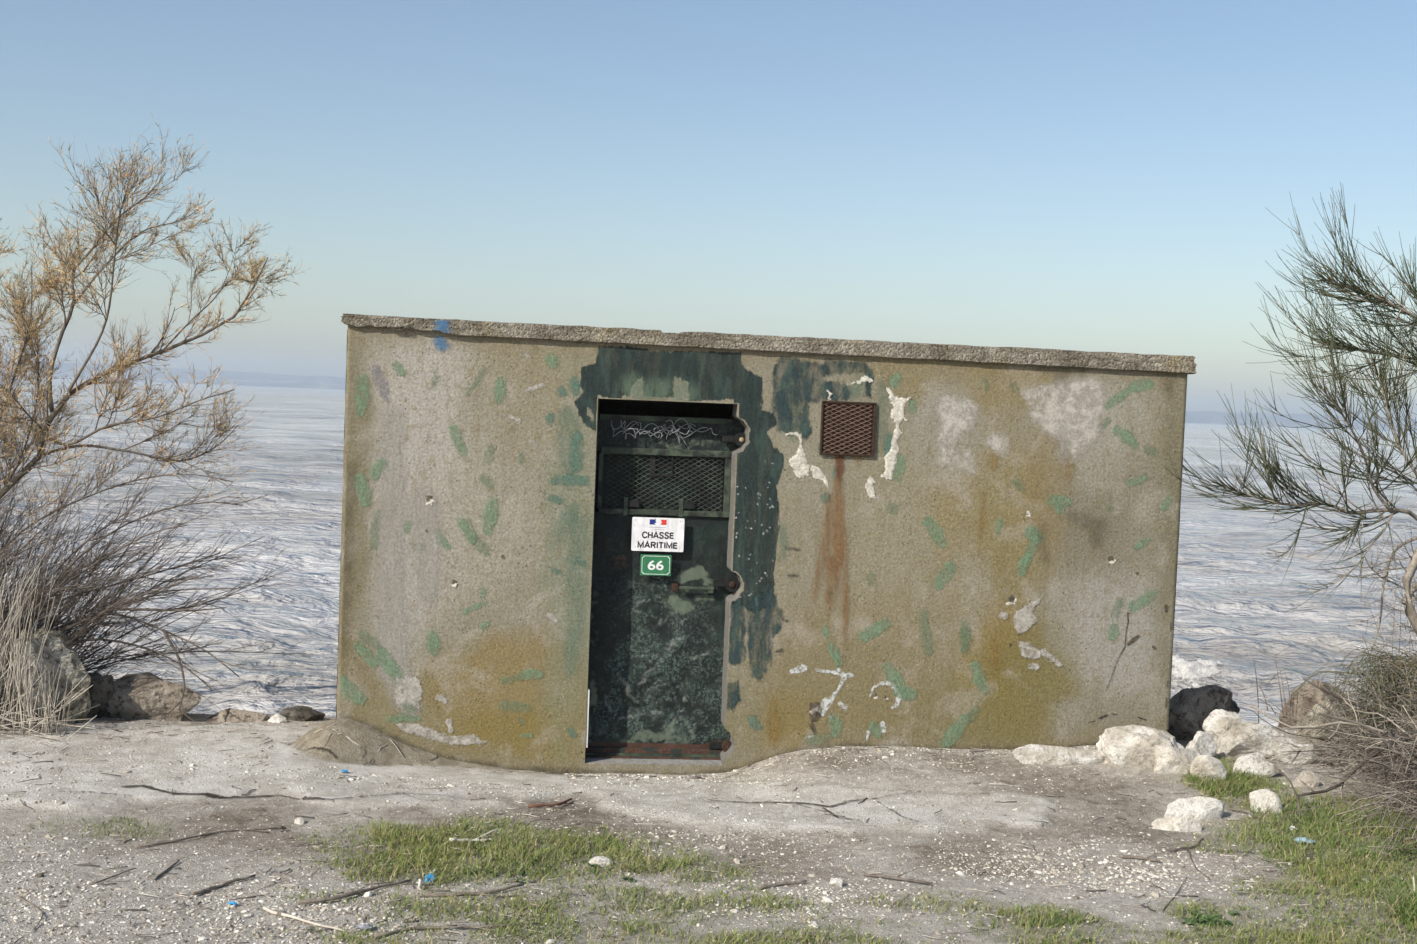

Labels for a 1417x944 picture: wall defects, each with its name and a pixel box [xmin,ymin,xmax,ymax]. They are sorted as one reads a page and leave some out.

flaking render [785,432,829,488]
flaking render [851,375,911,498]
corrosion [816,455,859,613]
flaking render [999,595,1063,670]
flaking render [395,676,487,745]
spalling [809,702,822,734]